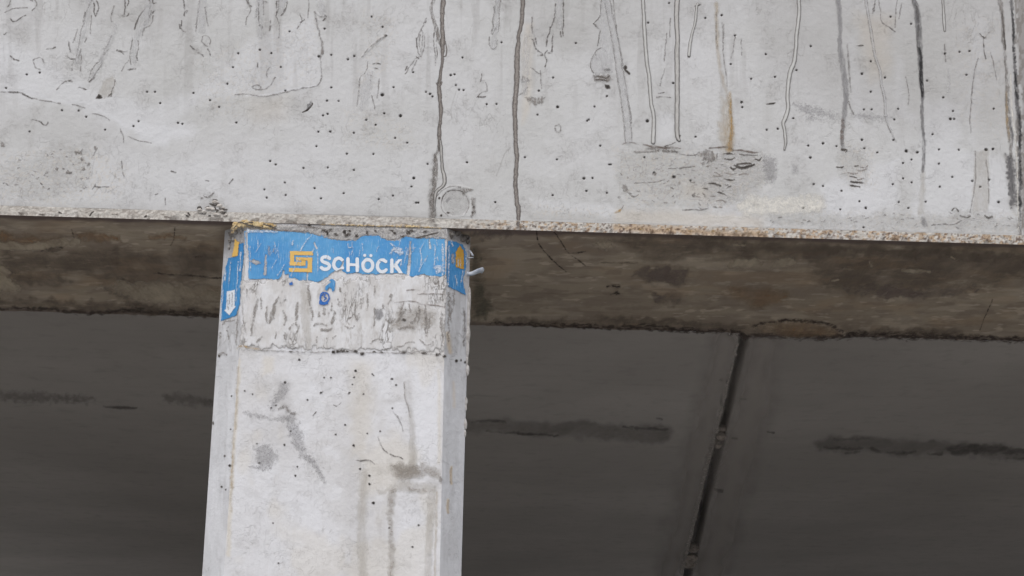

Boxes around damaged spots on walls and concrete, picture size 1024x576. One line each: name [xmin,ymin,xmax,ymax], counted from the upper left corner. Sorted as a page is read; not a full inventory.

crack [430,0,447,222]
crack [512,0,583,270]
leakage [641,0,656,144]
leakage [674,0,701,142]
leakage [781,0,801,151]
leakage [837,0,854,151]
leakage [912,0,925,172]
leakage [970,0,1022,232]